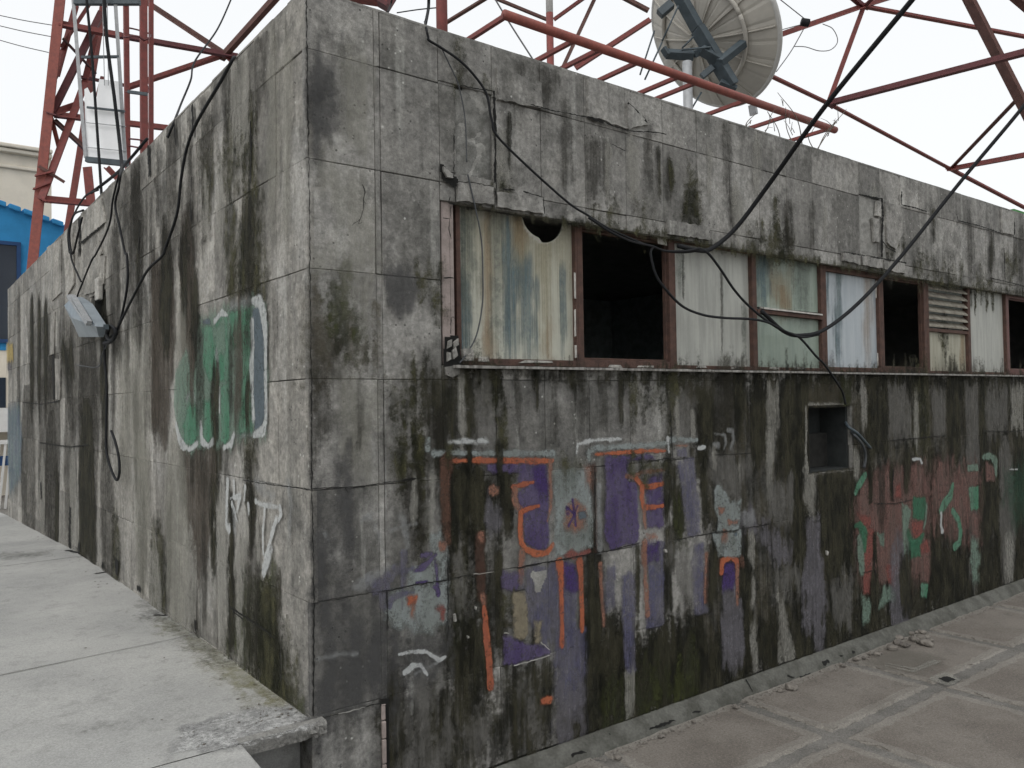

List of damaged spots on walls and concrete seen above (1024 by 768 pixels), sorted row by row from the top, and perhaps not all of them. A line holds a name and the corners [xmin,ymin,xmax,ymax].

crack [174,103,194,147]
spalling [440,88,544,214]
water stain [498,105,516,178]
crack [530,102,666,151]
crack [78,217,103,255]
water stain [101,212,128,350]
water stain [197,57,269,562]
crack [243,0,491,718]
water stain [456,111,821,354]
water stain [17,292,121,582]
water stain [116,159,1024,768]
crack [517,466,639,569]